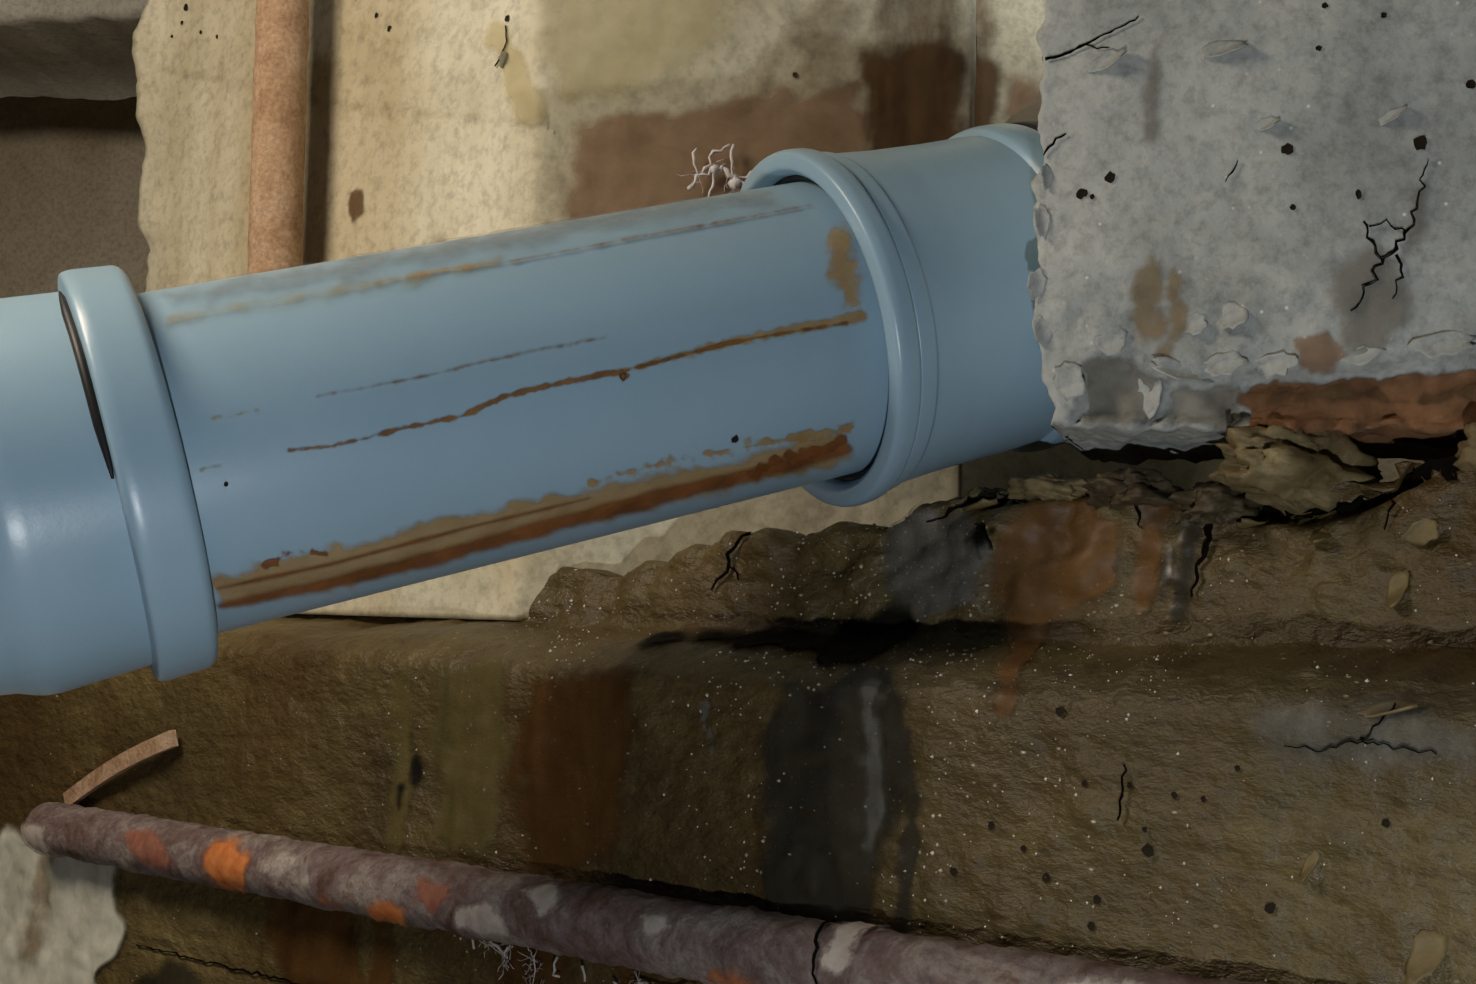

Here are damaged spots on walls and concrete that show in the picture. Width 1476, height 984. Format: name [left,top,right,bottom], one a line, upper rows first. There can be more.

crack [1045,16,1139,61]
crack [1350,159,1429,311]
corrosion [1231,333,1476,449]
crack [711,531,751,590]
crack [1283,703,1437,755]
damp [640,603,920,932]
crack [136,944,299,984]